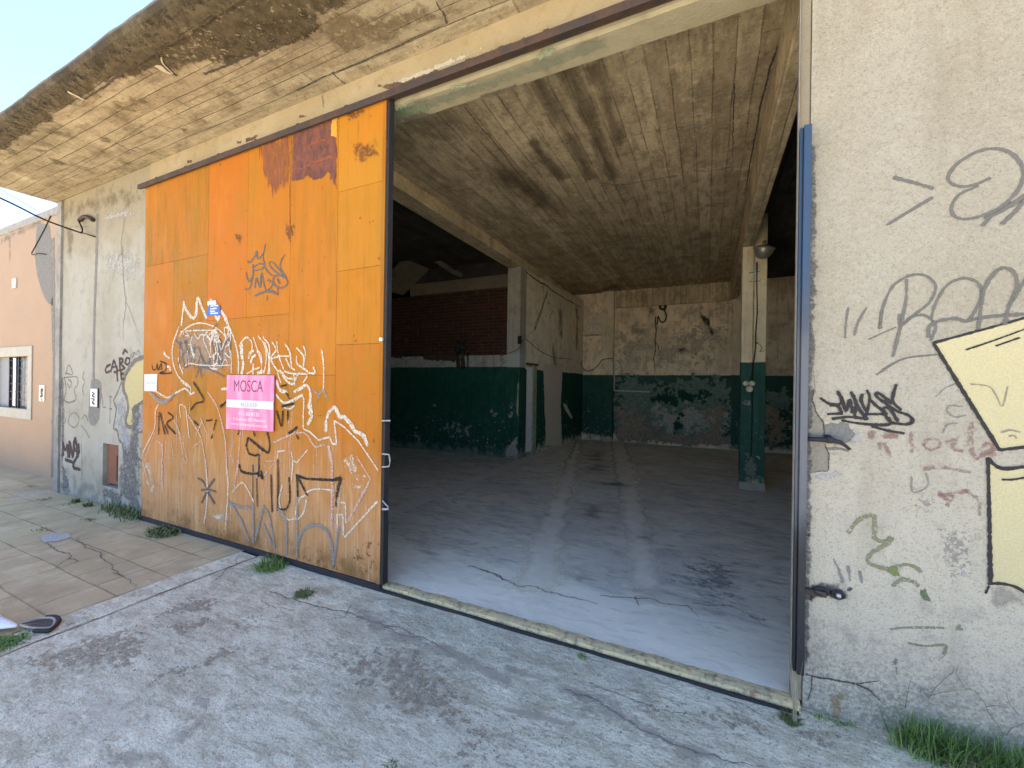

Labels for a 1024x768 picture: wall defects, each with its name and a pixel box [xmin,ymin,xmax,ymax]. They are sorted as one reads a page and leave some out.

water stain [0,0,432,150]
rust [354,105,387,163]
water stain [499,169,549,208]
water stain [530,141,564,179]
water stain [536,79,594,180]
water stain [560,64,622,179]
peeling [613,302,751,447]
flaking render [807,310,861,481]
crack [47,537,262,606]
crack [467,566,761,623]
crack [805,673,881,701]